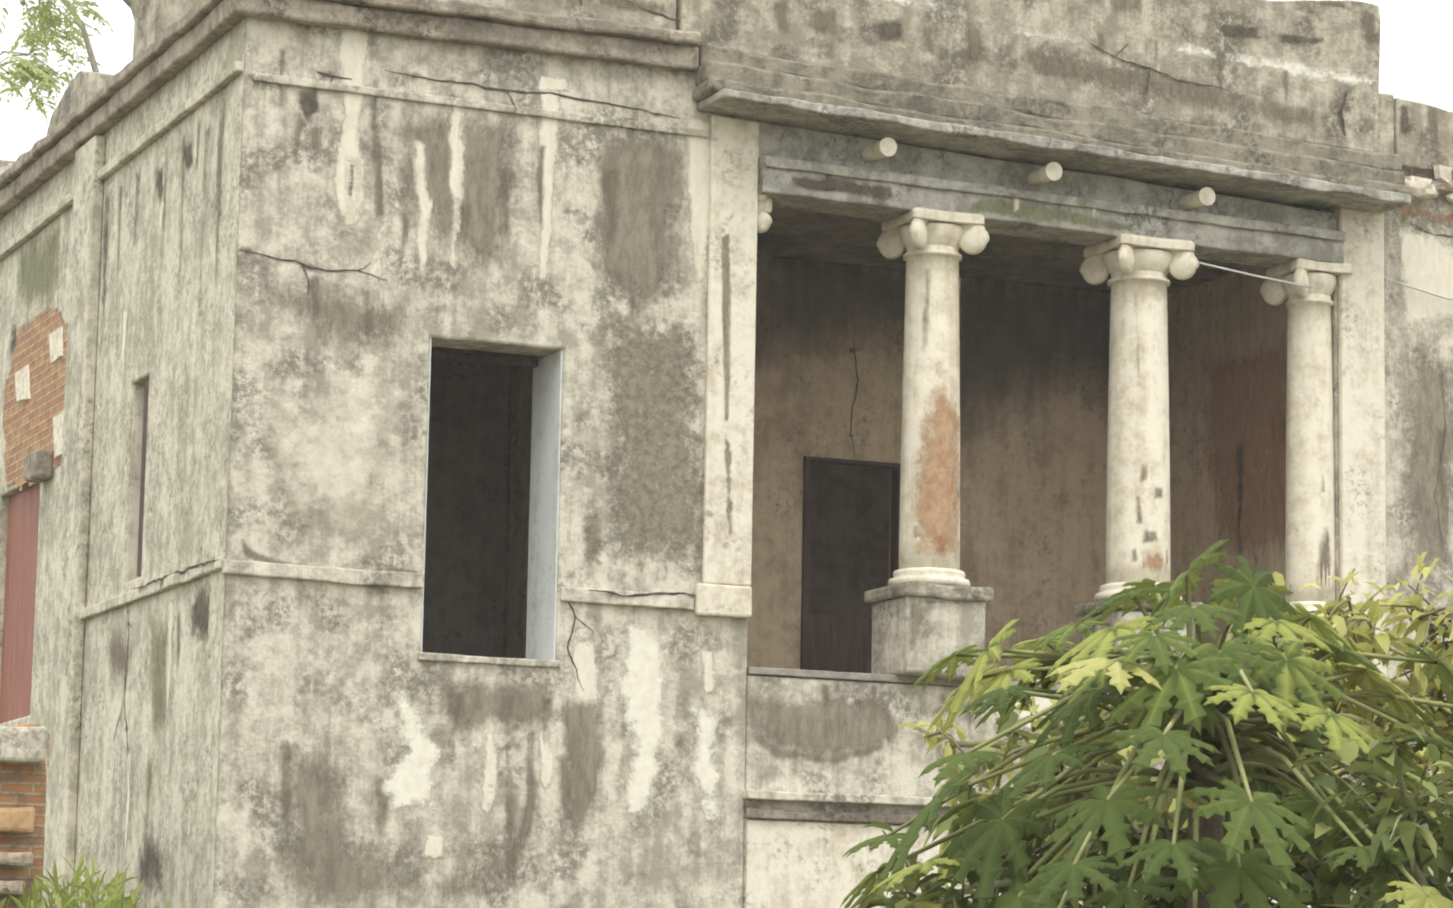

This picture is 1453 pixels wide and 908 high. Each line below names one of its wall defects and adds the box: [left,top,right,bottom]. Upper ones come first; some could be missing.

crack [626,0,680,22]
crack [1088,42,1230,95]
spalling [2,307,68,491]
crack [240,249,388,295]
leakage [278,29,512,341]
leakage [537,76,569,281]
leakage [583,117,711,568]
crack [850,342,859,457]
leakage [1396,205,1453,329]
leakage [376,693,441,827]
leakage [443,642,605,892]
leakage [618,624,668,815]